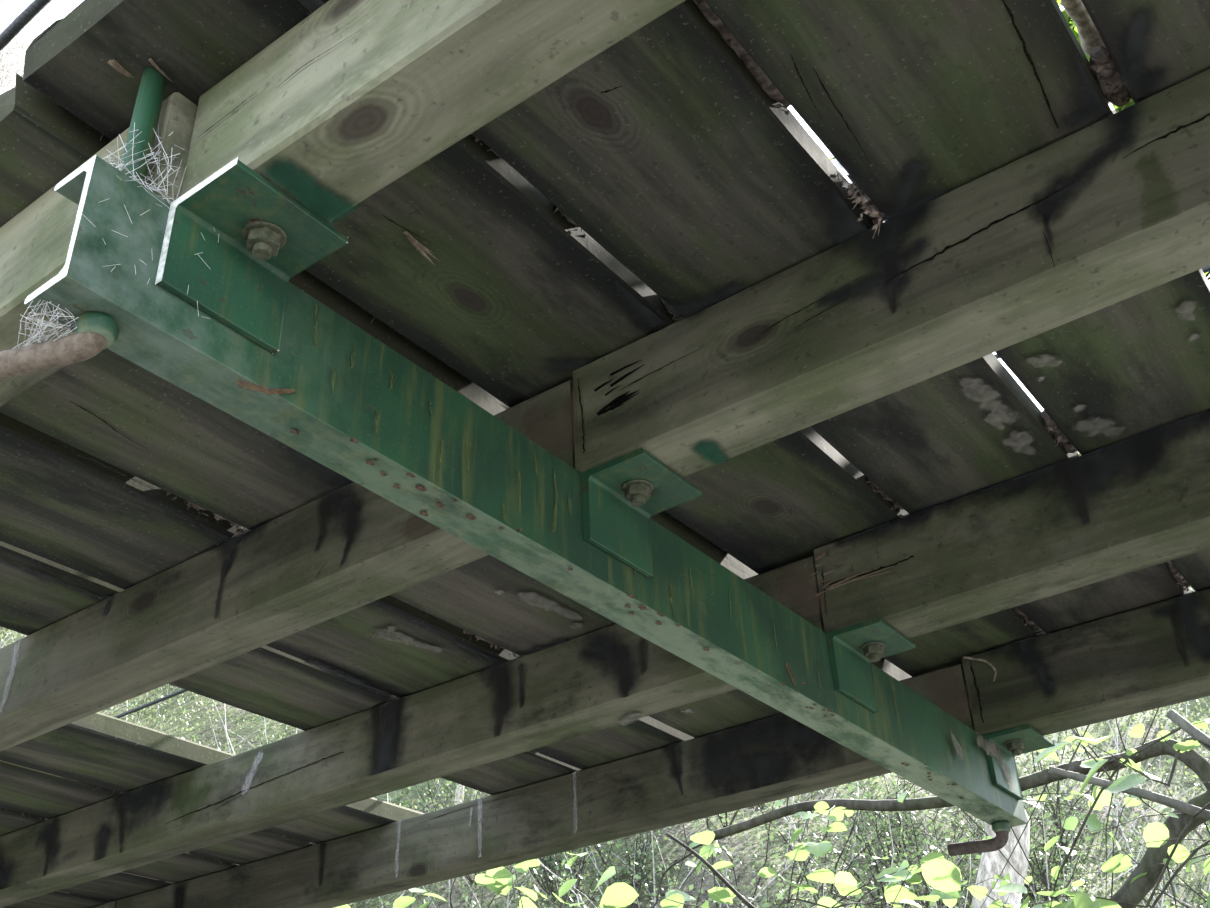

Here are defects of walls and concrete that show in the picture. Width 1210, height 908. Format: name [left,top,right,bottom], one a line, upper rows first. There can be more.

crack [790,54,871,164]
crack [1002,0,1059,129]
leakage [1032,9,1164,254]
crack [1123,113,1210,158]
leakage [281,444,361,566]
leakage [835,409,1210,546]
leakage [455,638,570,737]
leakage [581,633,647,697]